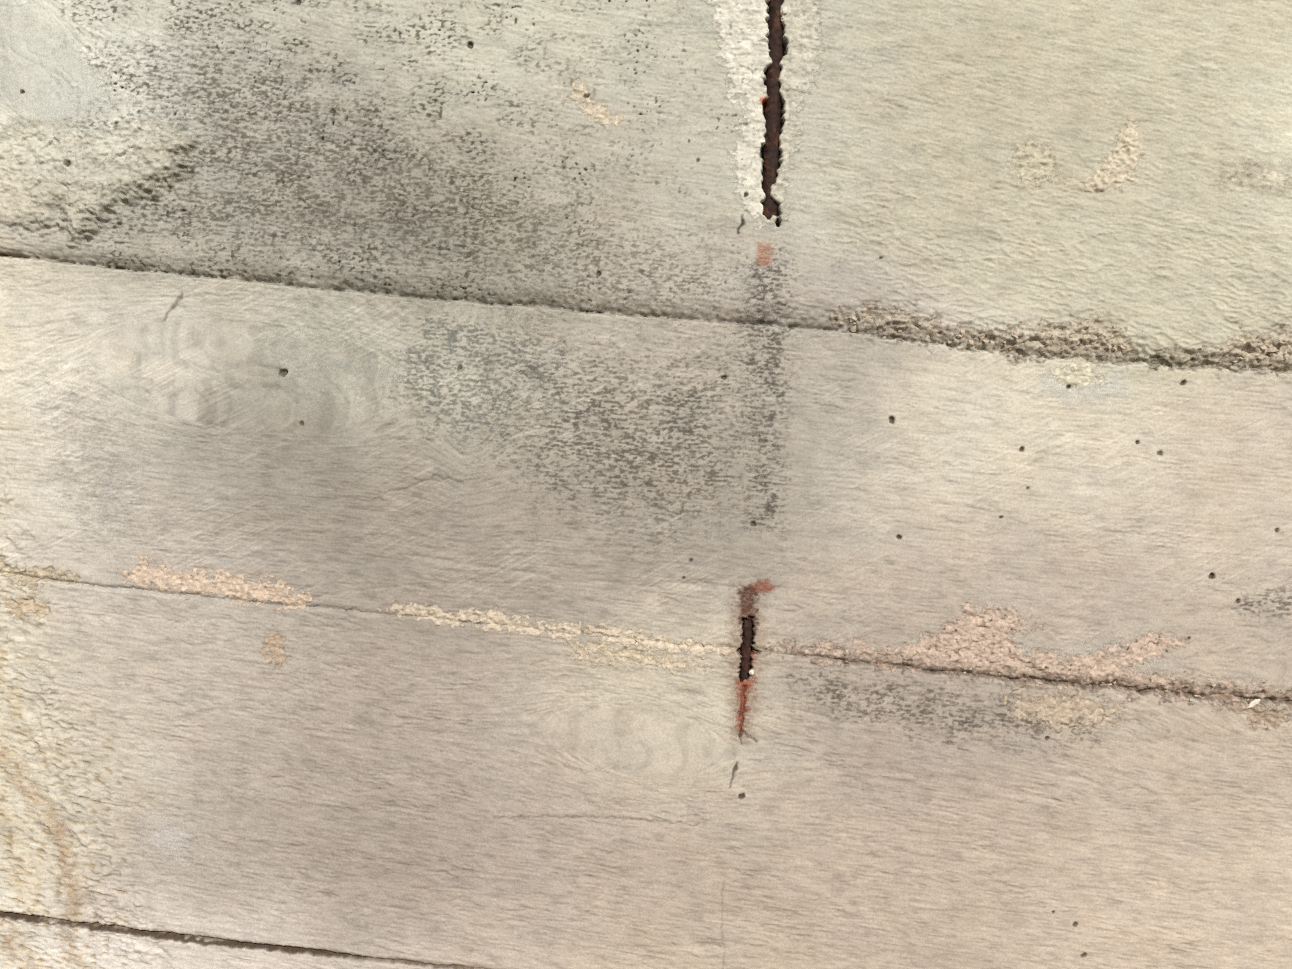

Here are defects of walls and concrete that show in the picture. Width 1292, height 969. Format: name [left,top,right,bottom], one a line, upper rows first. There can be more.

spalling [562,80,632,128]
spalling [703,0,825,231]
corrosion [735,581,775,734]
spalling [377,600,1292,738]